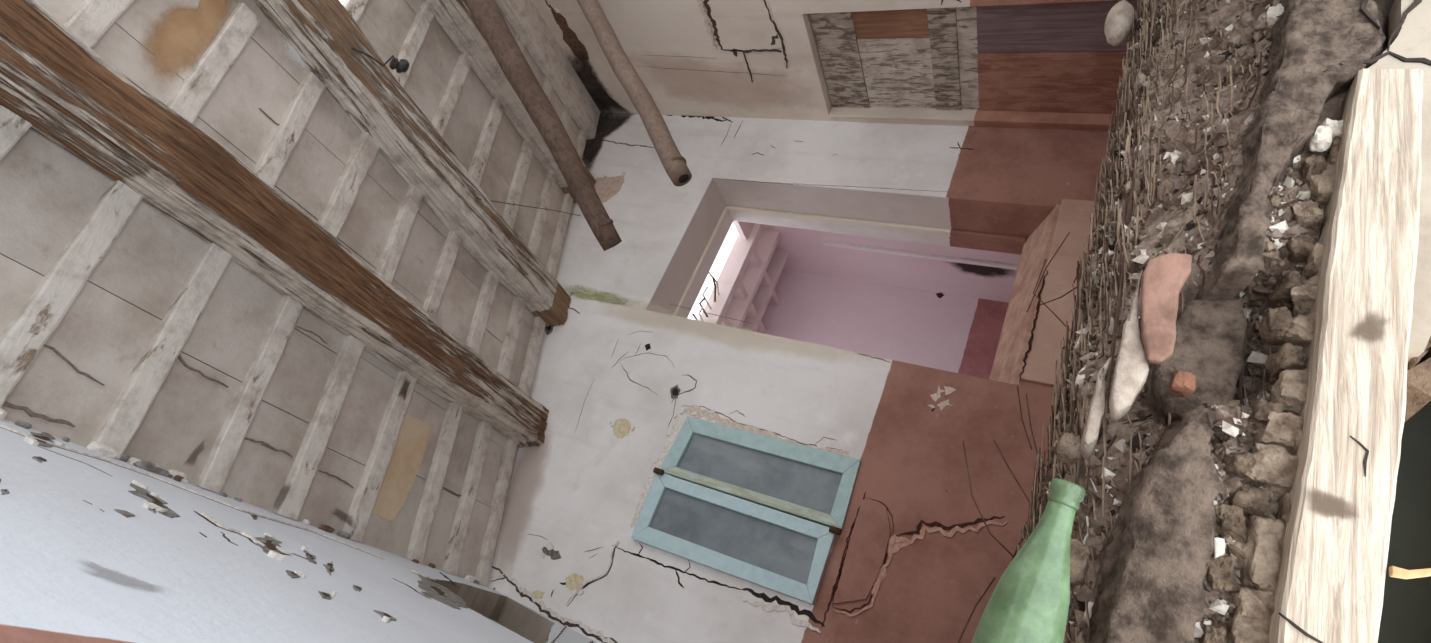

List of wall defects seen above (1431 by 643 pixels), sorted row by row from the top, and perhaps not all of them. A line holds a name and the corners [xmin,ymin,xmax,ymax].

water stain [147,0,229,74]
crack [635,0,788,82]
crack [1324,0,1431,72]
crack [575,331,838,450]
spalling [114,480,180,518]
spalling [251,514,362,600]
crack [743,497,1007,626]
spalling [373,610,397,622]